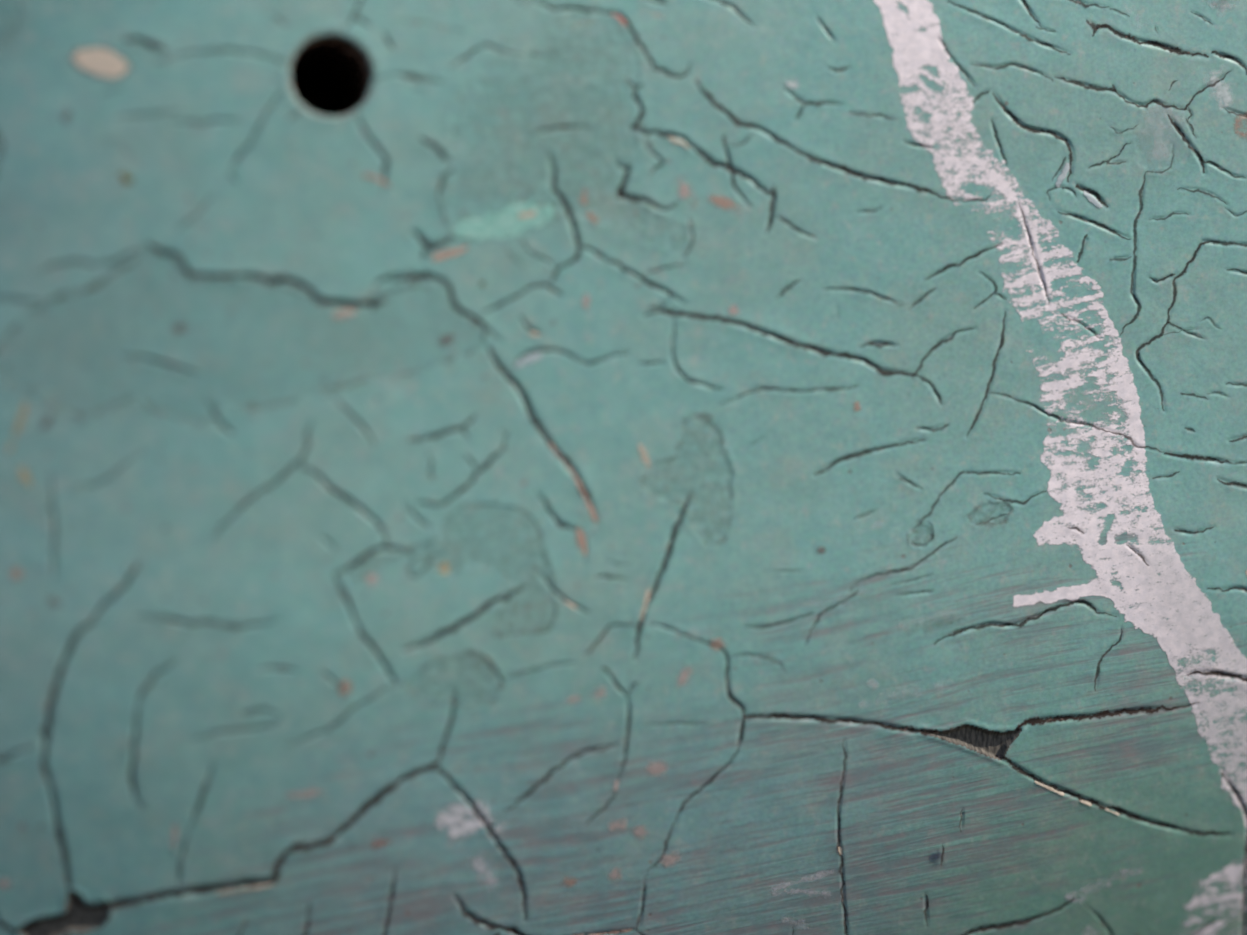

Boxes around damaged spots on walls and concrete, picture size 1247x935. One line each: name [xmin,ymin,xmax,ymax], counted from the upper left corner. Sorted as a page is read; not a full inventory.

crack [33,0,1247,580]
crack [212,420,589,684]
crack [0,492,938,935]
crack [744,471,1047,645]
crack [934,600,1247,935]
crack [1207,585,1247,593]